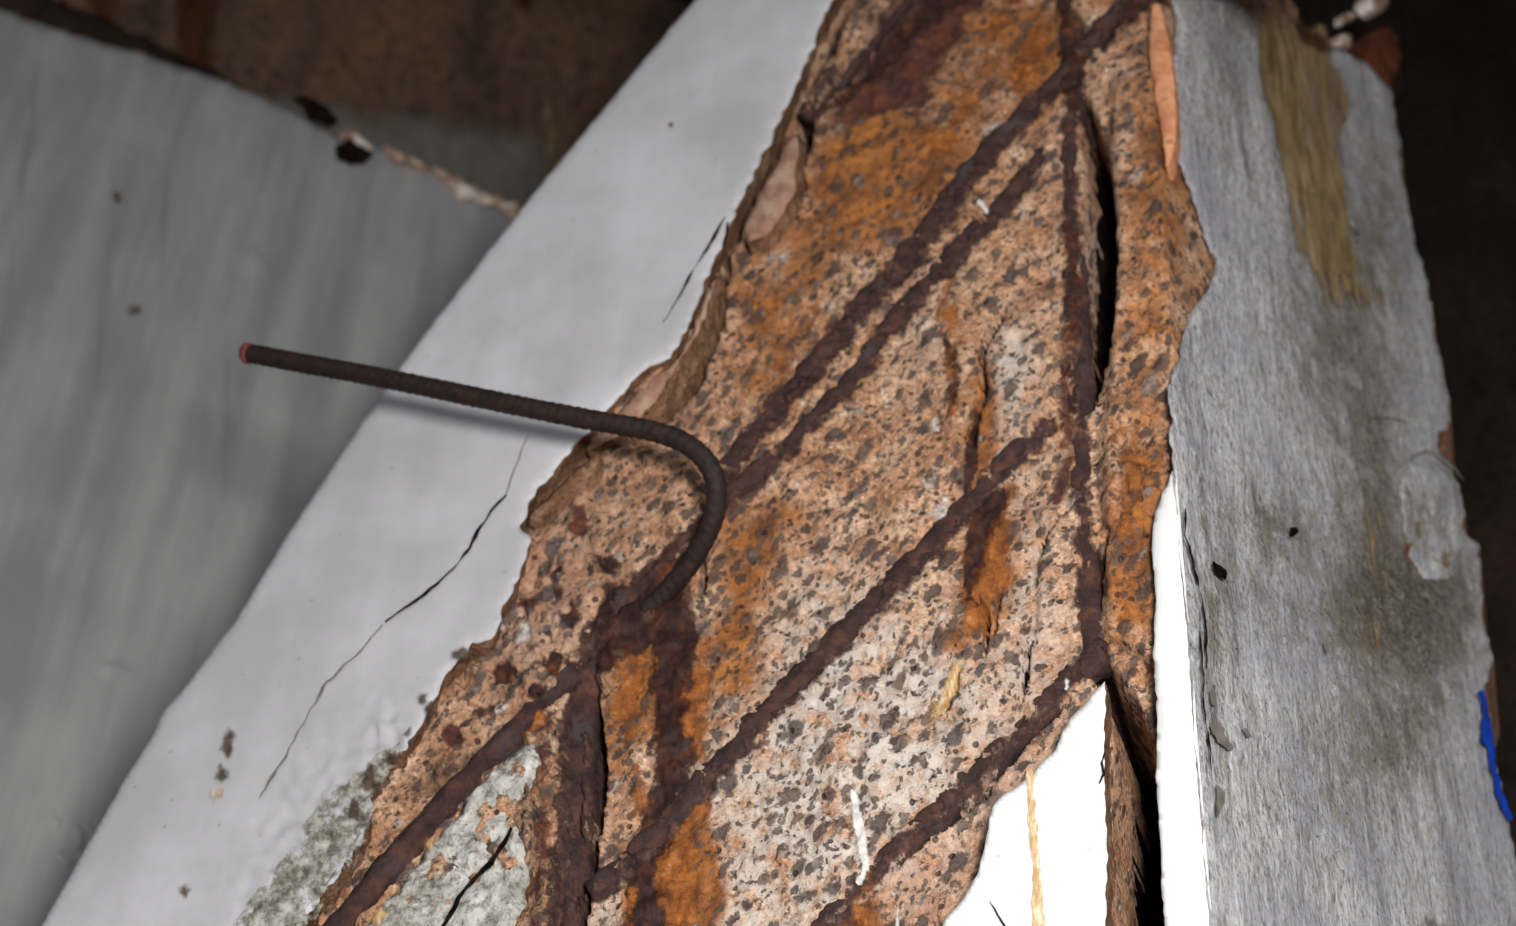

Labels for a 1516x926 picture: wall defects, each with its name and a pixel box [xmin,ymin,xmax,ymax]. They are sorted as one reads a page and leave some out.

rust [829,0,1102,164]
crack [663,217,729,322]
crack [1089,140,1119,402]
spalling [239,0,1215,926]
rust [935,276,1018,635]
crack [260,435,528,797]
crack [441,827,513,926]
rust [493,651,564,781]
rust [593,538,712,926]
rust [1026,770,1045,926]
peeling [1216,785,1225,817]
peeling [1210,690,1252,750]